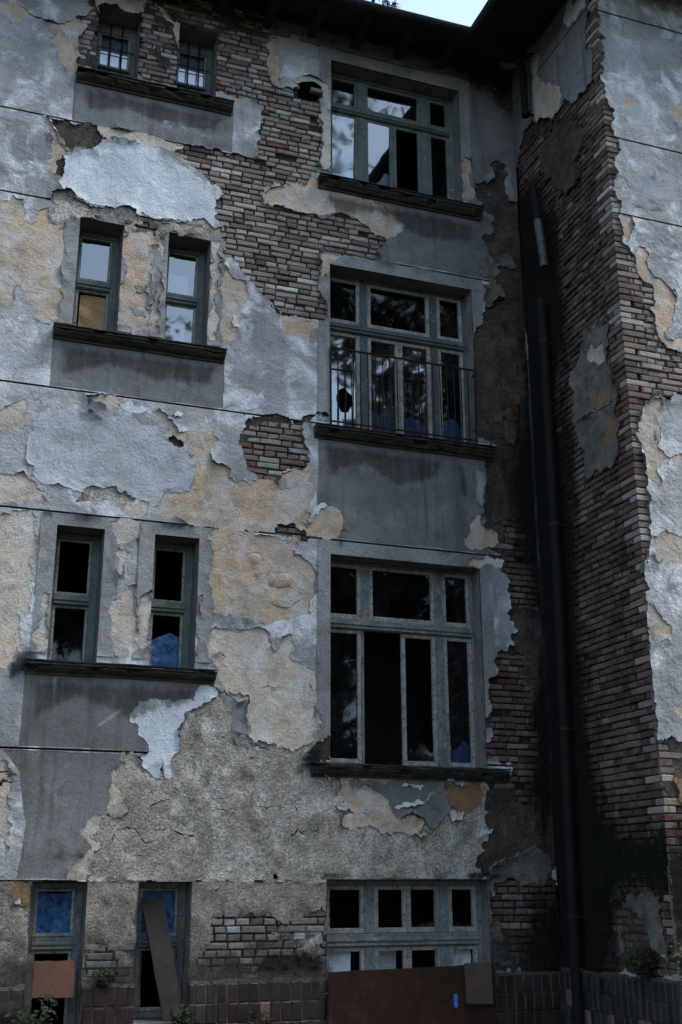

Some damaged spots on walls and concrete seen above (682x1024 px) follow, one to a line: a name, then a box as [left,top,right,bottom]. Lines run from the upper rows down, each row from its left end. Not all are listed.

spalling [0,0,405,342]
crack [218,799,307,835]
spalling [0,157,556,983]
spalling [516,0,682,978]